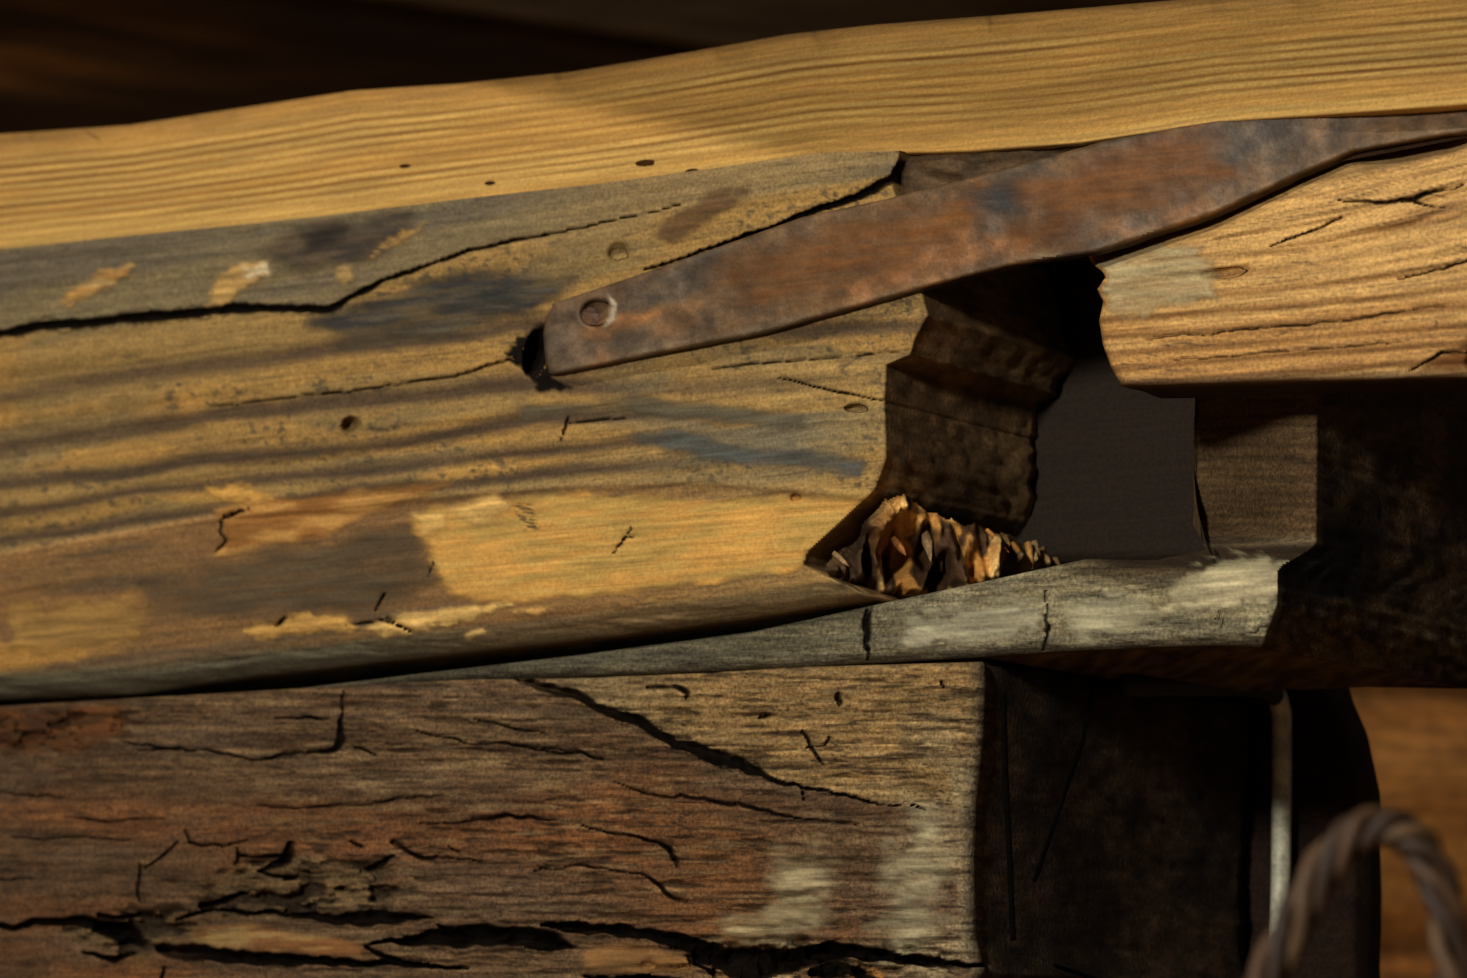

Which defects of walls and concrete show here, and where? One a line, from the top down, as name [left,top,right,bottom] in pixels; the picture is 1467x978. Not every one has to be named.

crack [658,167,898,266]
crack [1279,190,1443,243]
crack [0,234,546,336]
crack [1167,312,1397,357]
crack [283,361,503,399]
crack [738,352,880,395]
crack [352,595,410,631]
crack [861,609,871,657]
crack [143,711,369,761]
crack [438,721,599,759]
crack [522,681,872,822]
crack [0,792,973,978]